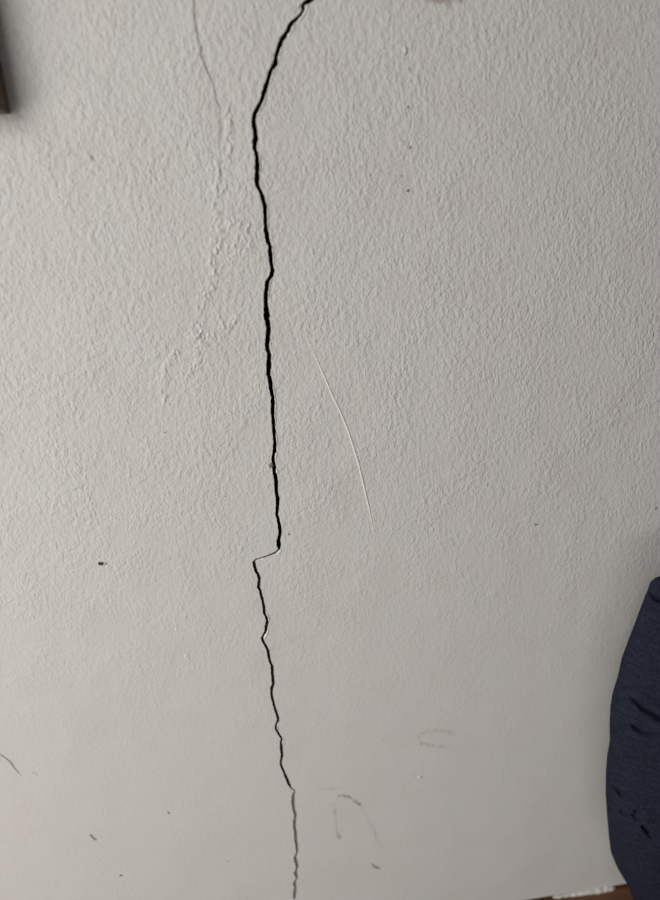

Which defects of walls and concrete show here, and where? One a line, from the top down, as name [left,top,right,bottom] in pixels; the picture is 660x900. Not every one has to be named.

crack [251,0,314,898]